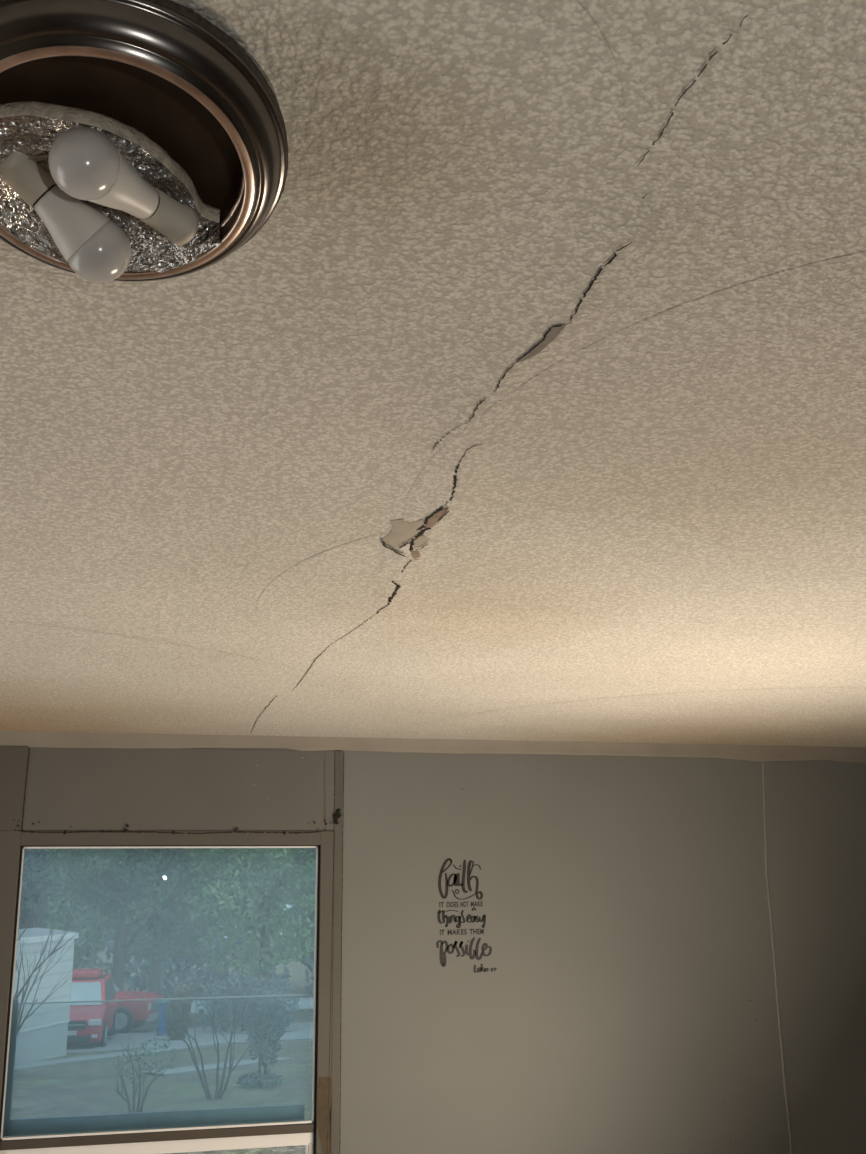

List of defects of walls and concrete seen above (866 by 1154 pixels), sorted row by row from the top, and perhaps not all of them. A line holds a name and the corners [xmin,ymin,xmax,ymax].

crack [637,15,748,167]
crack [567,242,632,325]
spalling [515,325,566,363]
crack [250,363,515,733]
peeling [381,507,449,560]